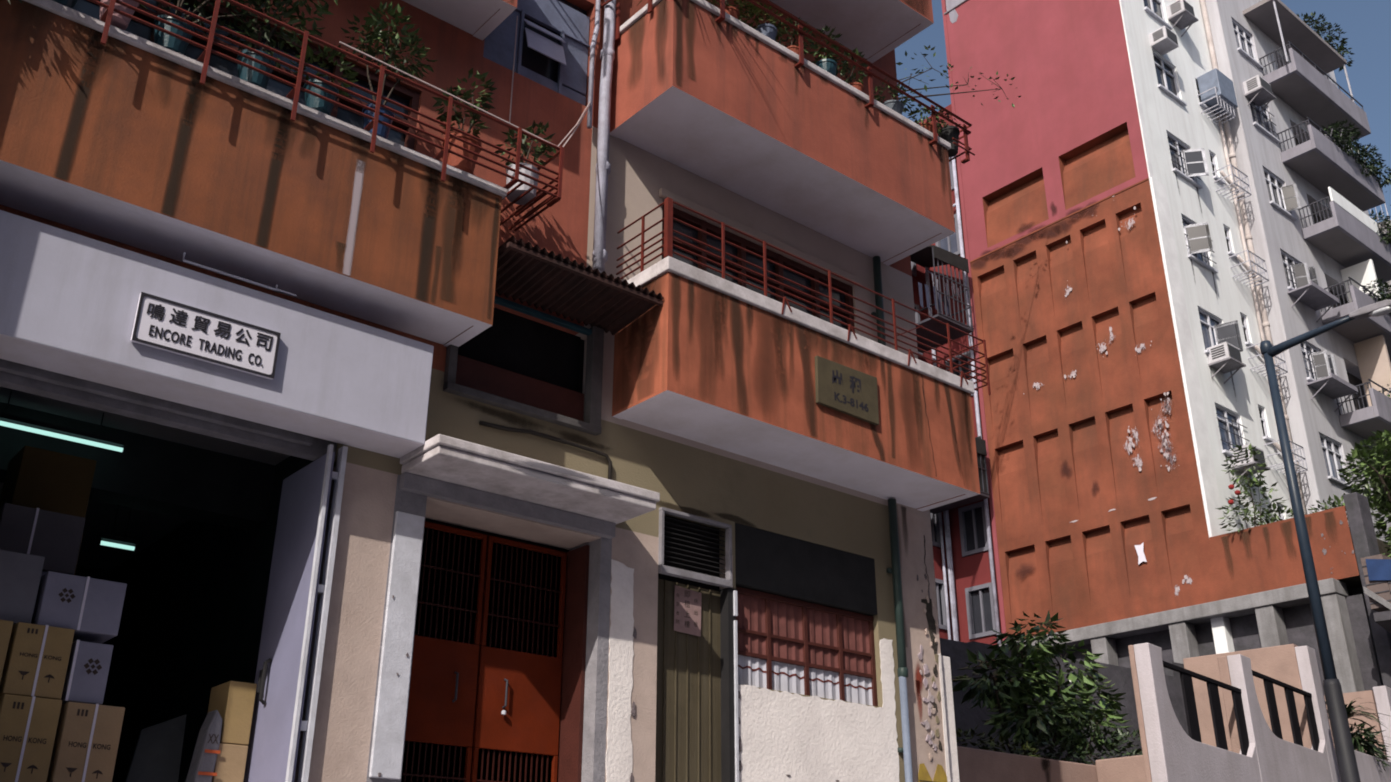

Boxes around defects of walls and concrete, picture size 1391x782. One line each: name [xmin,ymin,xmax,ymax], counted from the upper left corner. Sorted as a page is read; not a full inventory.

leakage [55,22,119,180]
leakage [161,70,212,216]
leakage [256,102,317,248]
leakage [337,135,369,276]
leakage [416,165,499,315]
leakage [630,0,694,86]
leakage [673,274,693,366]
leakage [715,290,752,403]
leakage [776,315,894,461]
leakage [913,370,970,442]
peeling [1124,392,1176,471]
peeling [917,535,943,760]